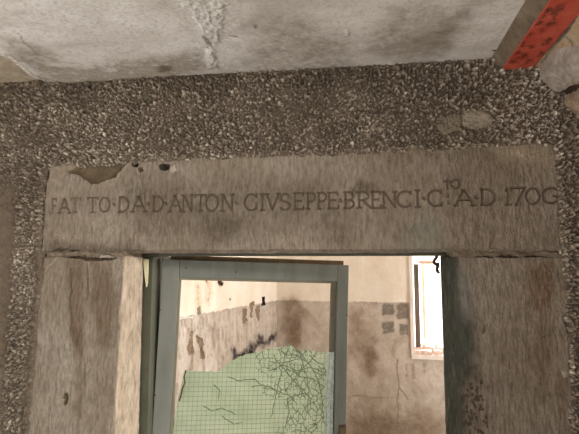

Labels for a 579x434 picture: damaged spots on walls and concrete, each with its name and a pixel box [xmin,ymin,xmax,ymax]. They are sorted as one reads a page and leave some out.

spalling [67,164,125,187]
crack [45,247,116,329]
peeling [242,297,266,324]
peeling [187,331,205,359]
water stain [231,334,277,360]
crack [256,345,332,434]